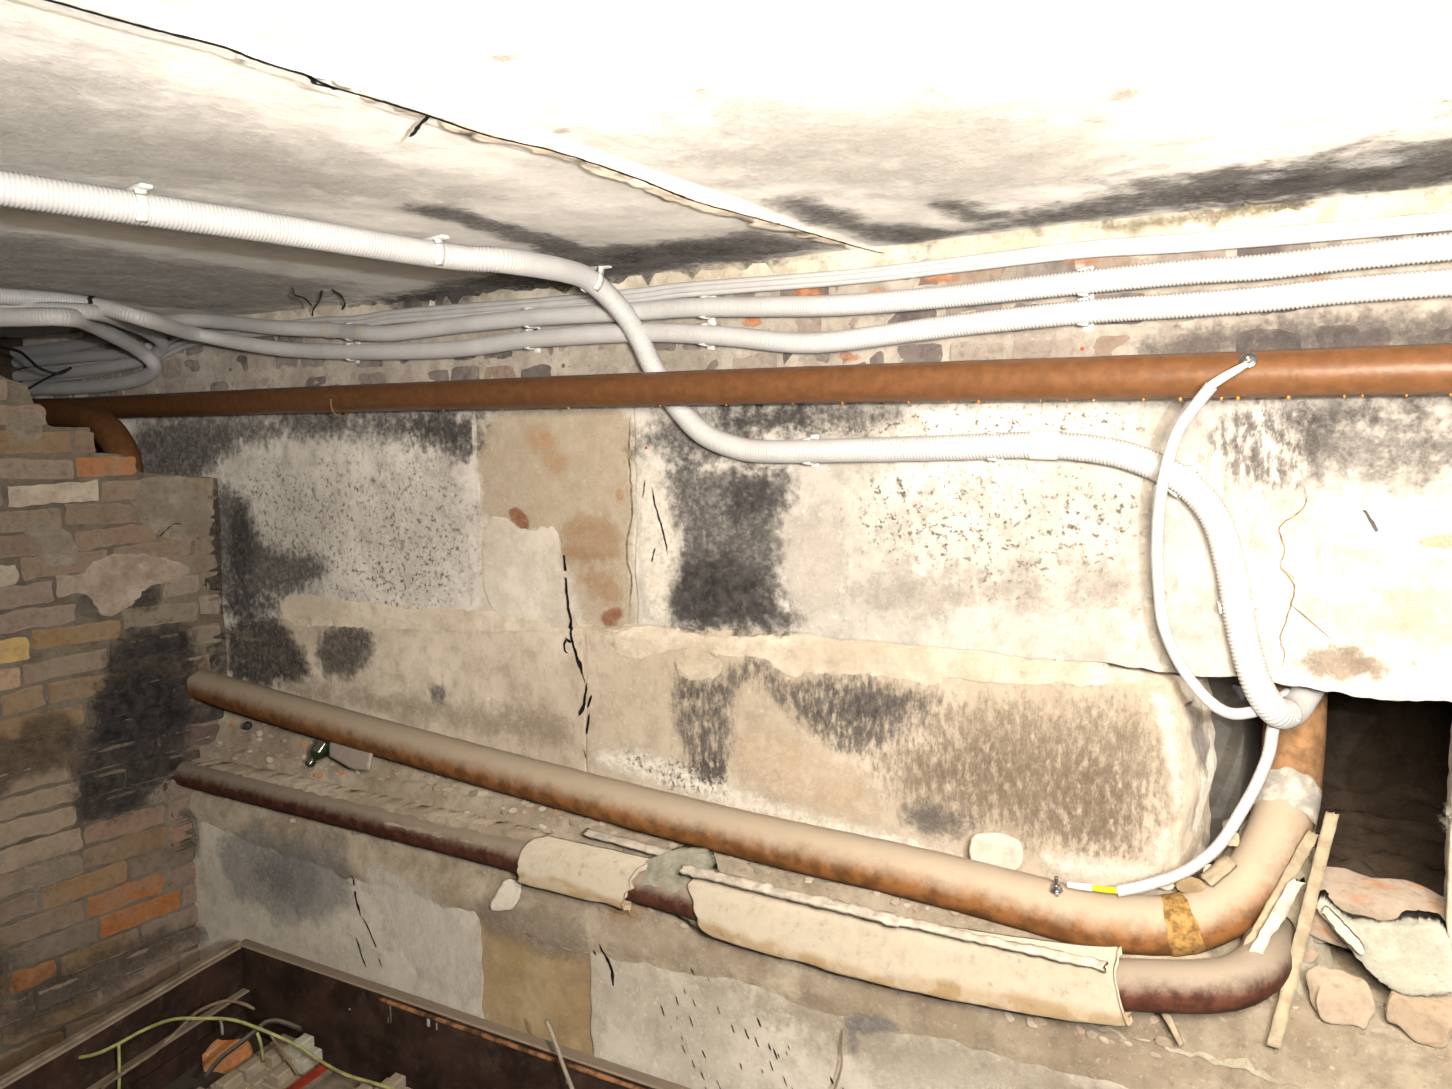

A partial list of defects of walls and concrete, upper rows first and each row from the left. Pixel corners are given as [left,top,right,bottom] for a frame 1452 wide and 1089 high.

water stain [0,236,344,311]
crack [45,0,882,253]
water stain [1109,202,1304,229]
water stain [1341,154,1399,168]
water stain [136,412,483,721]
crack [561,541,592,758]
water stain [635,419,790,635]
water stain [715,403,1138,439]
water stain [148,780,199,853]
water stain [593,661,1215,880]